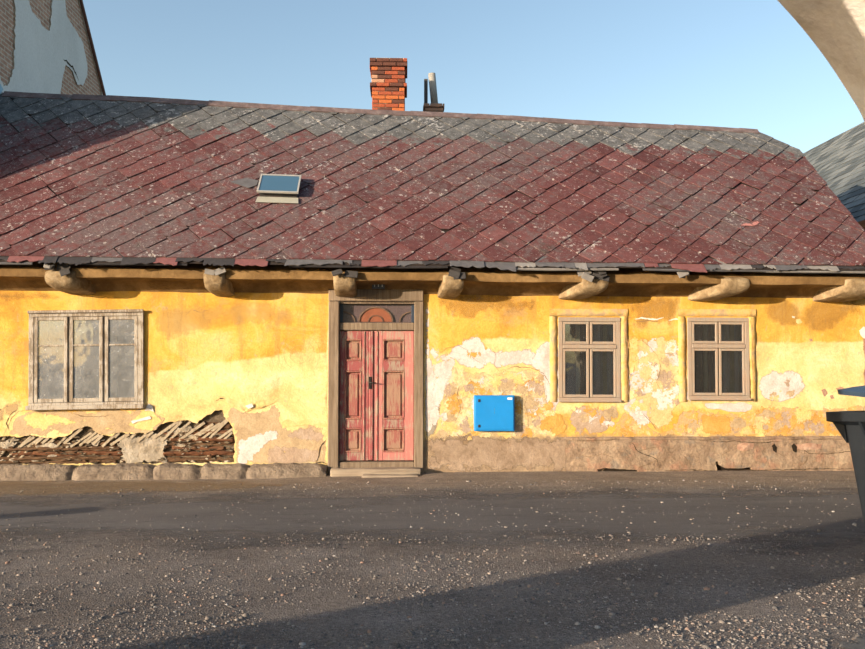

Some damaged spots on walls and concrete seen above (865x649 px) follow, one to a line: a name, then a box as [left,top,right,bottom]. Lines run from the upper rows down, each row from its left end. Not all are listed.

spalling [0,0,16,86]
spalling [29,0,53,31]
spalling [61,0,102,95]
peeling [425,309,865,451]
spalling [0,394,328,465]
crack [632,440,852,471]